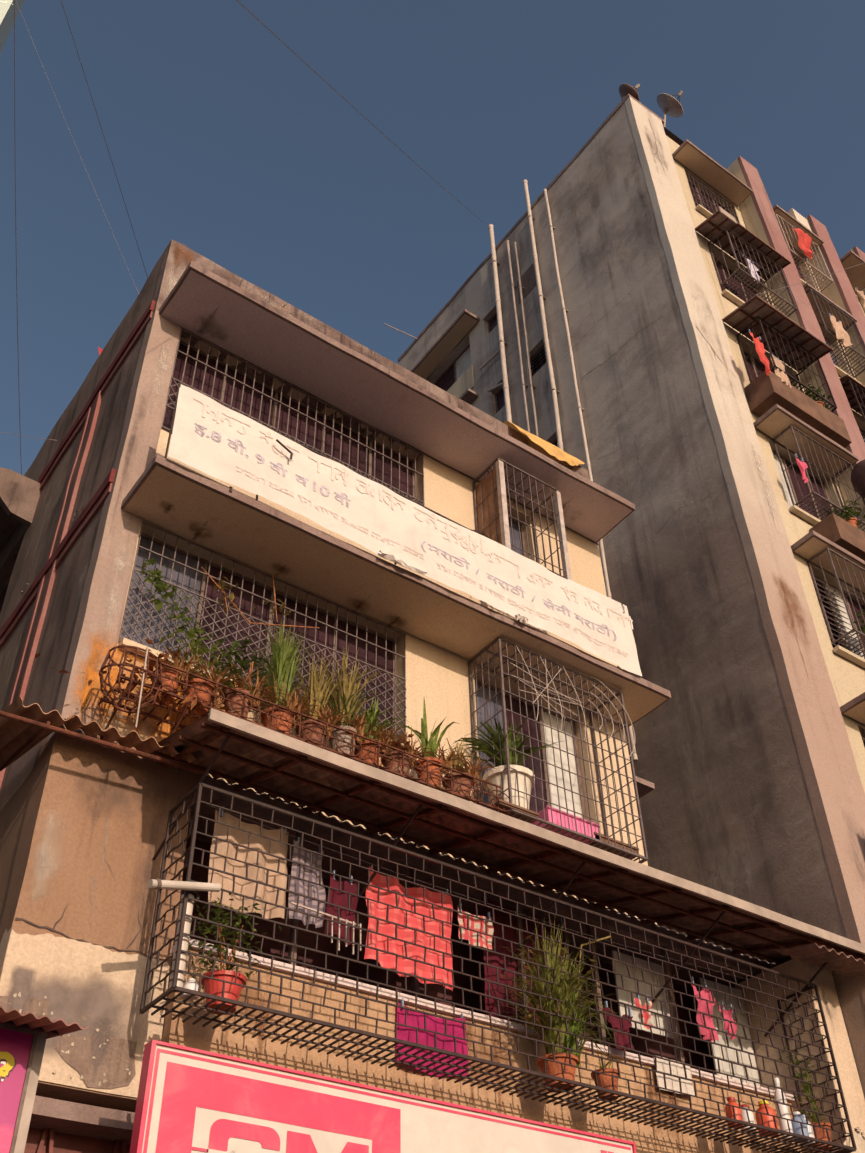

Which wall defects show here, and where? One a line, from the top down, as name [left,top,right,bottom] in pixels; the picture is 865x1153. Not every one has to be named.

corrosion [79,643,196,739]
crack [16,819,168,961]